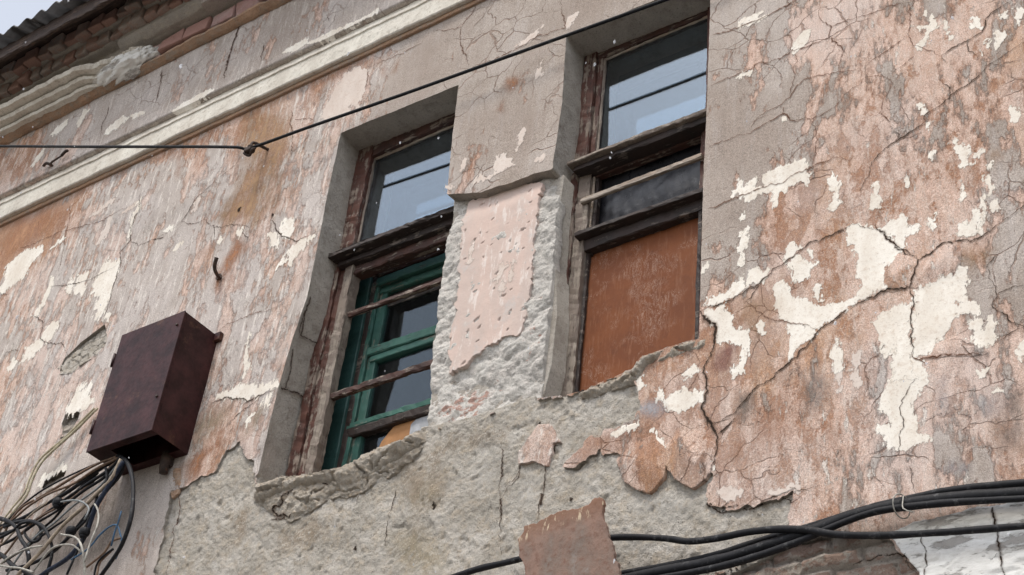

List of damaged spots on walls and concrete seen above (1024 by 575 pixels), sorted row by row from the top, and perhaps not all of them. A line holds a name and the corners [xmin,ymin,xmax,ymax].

peeling [321,66,371,122]
crack [366,1,566,83]
crack [708,0,1022,209]
peeling [0,235,66,295]
crack [21,156,248,314]
peeling [948,138,1001,237]
peeling [31,255,122,438]
spalling [155,158,937,575]
crack [700,205,1024,488]
peeling [870,265,999,452]
crack [498,445,558,555]
crack [706,486,816,525]